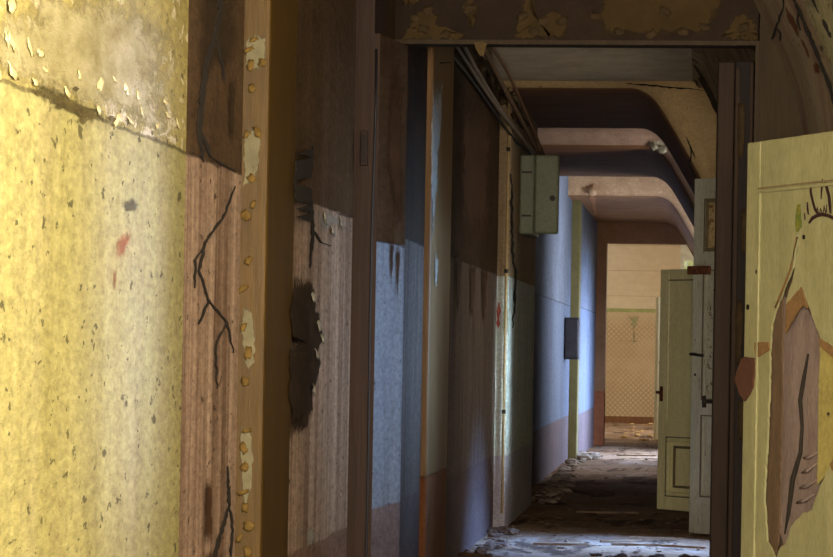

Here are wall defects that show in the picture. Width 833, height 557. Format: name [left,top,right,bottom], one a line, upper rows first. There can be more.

peeling [0,0,180,135]
peeling [588,0,720,40]
crack [771,0,833,104]
water stain [803,0,833,77]
peeling [240,308,256,387]
crack [213,466,234,557]
peeling [236,428,255,557]